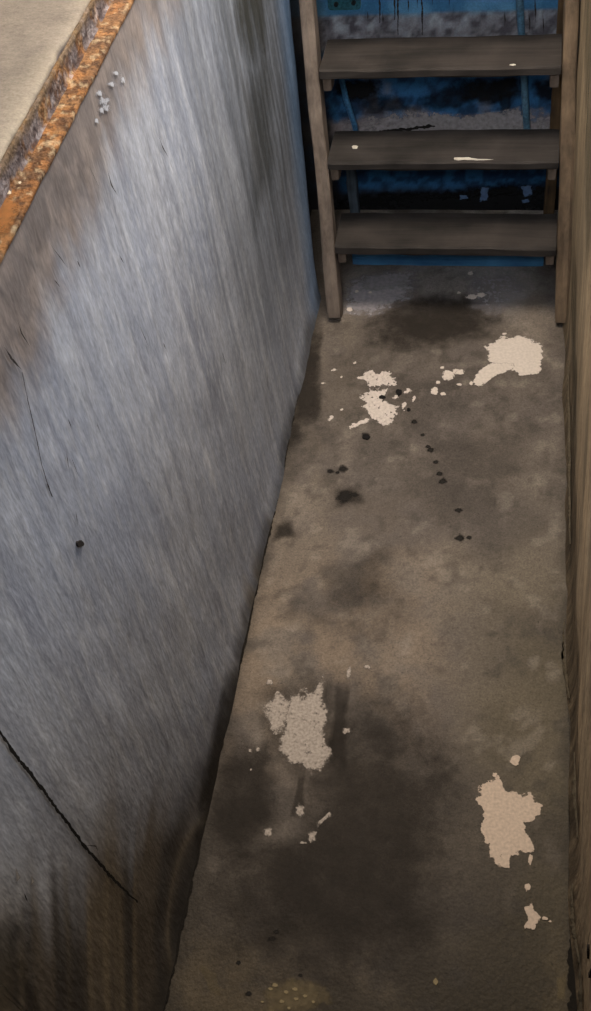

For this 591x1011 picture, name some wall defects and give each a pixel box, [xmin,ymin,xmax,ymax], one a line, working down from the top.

corrosion [0,181,21,233]
leakage [346,271,490,347]
peeling [349,370,416,440]
peeling [431,333,545,395]
crack [238,500,278,677]
peeling [263,676,332,772]
crack [0,730,138,903]
peeling [300,812,331,844]
peeling [476,773,543,868]
crack [163,741,224,1011]